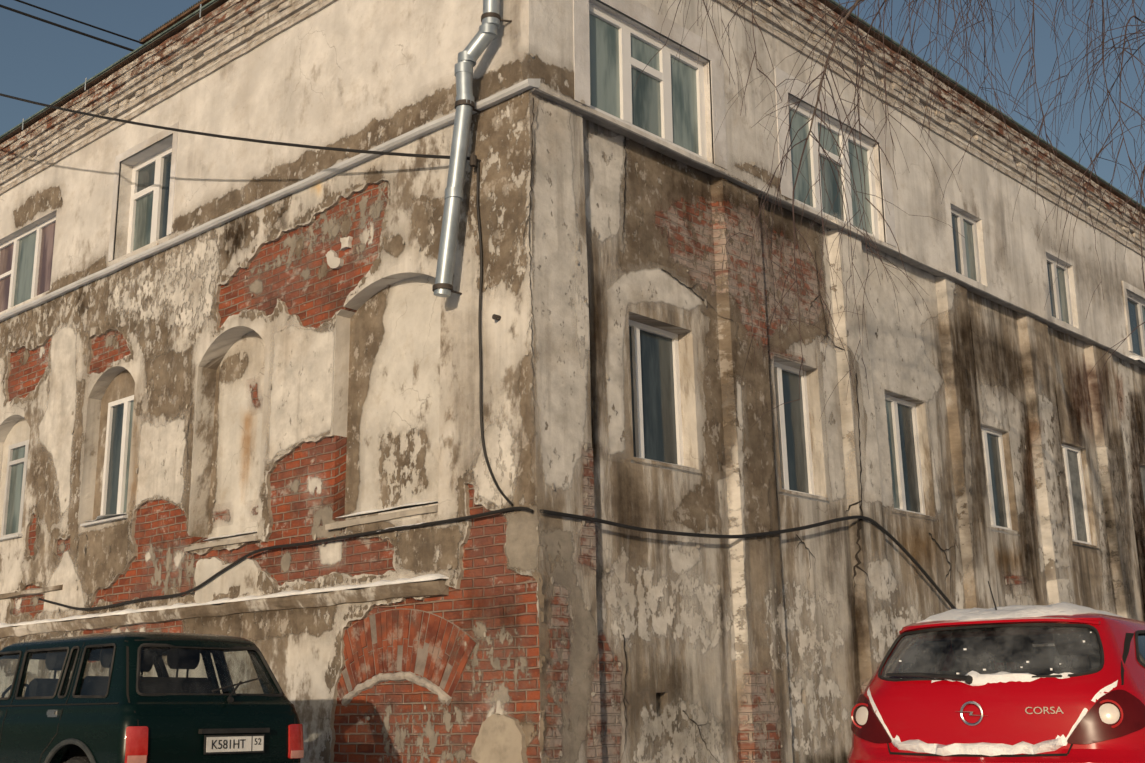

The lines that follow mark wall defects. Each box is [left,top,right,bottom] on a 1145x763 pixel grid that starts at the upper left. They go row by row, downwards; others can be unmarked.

spalling [0,53,956,763]
peeling [955,384,1073,609]
damp [1023,441,1037,594]
damp [1072,364,1108,424]
damp [1104,395,1145,620]